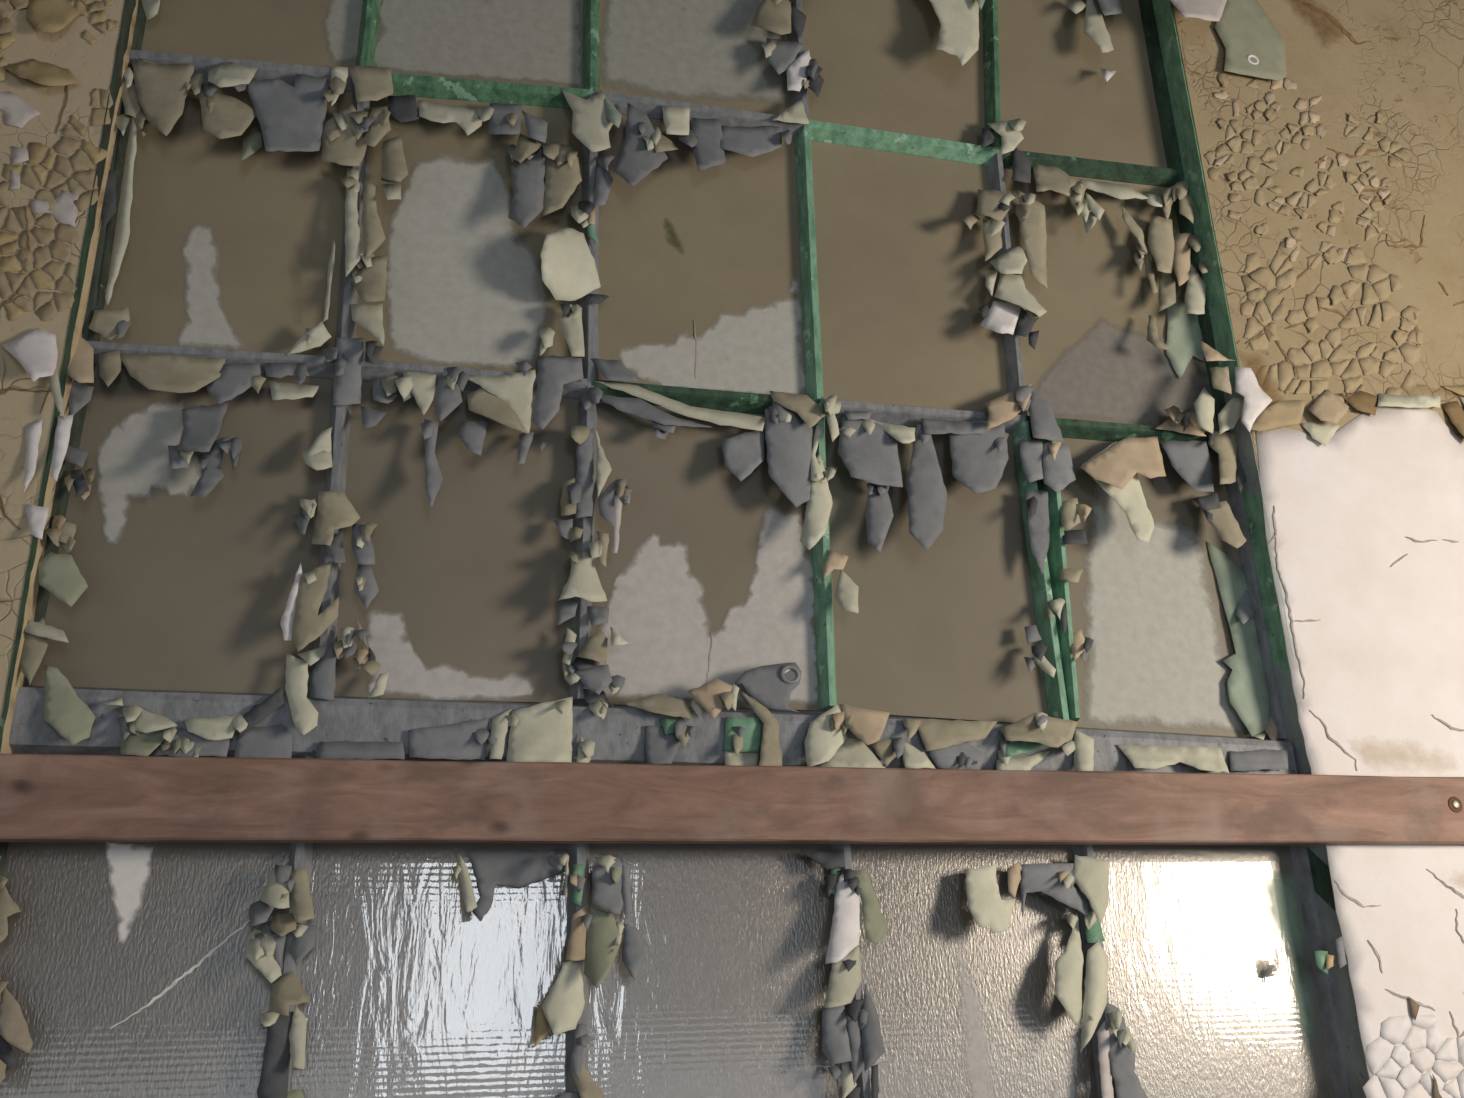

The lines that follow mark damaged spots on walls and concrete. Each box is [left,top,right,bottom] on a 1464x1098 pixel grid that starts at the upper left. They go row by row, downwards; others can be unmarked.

flaking render [0,0,1464,777]
crack [1246,254,1351,385]
crack [1315,148,1425,248]
crack [1269,506,1358,771]
crack [1391,536,1459,567]
crack [1432,714,1464,731]
peeling [245,865,316,1098]
peeling [452,849,646,1098]
peeling [800,850,889,1098]
peeling [964,855,1148,1098]
flaking render [1314,845,1464,1098]
crack [1335,869,1464,1038]